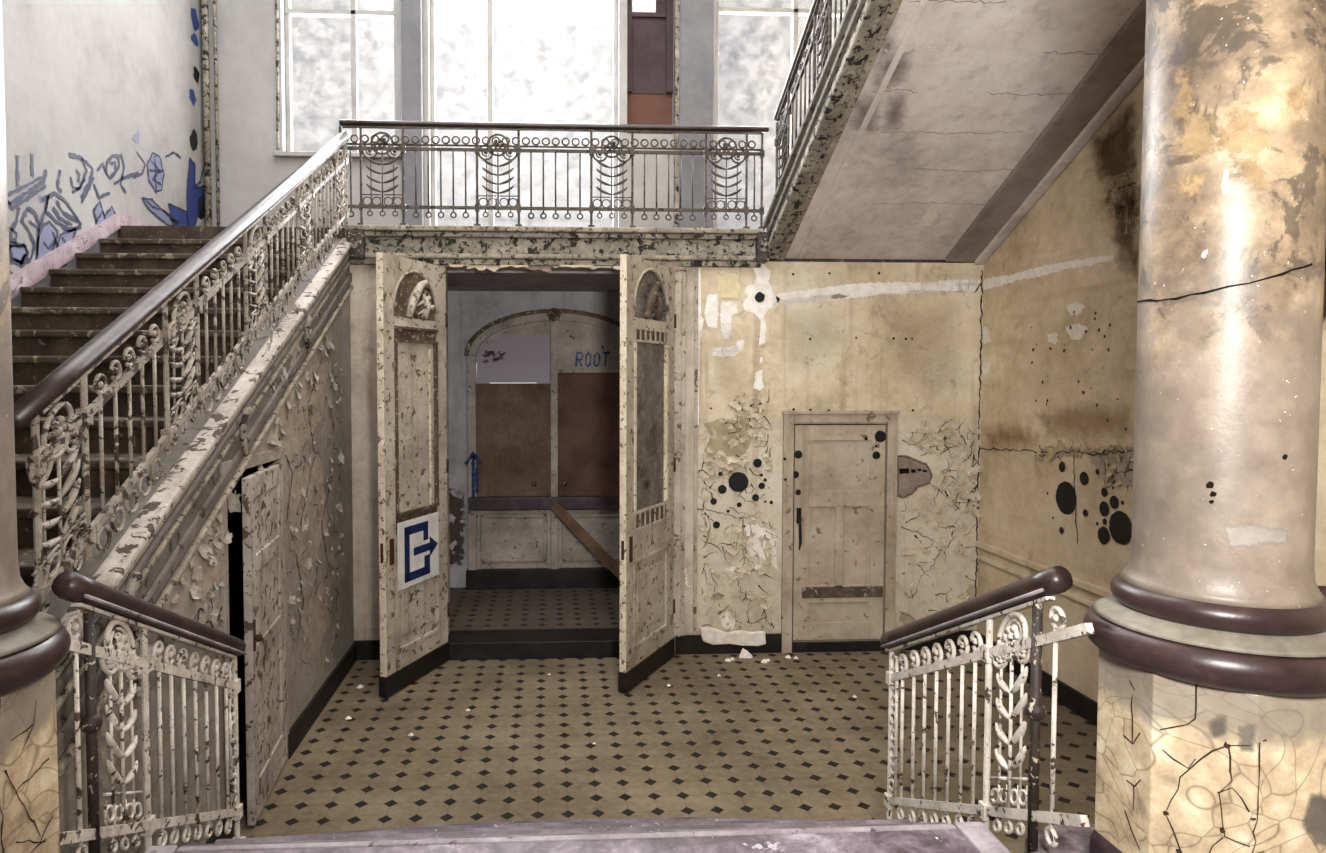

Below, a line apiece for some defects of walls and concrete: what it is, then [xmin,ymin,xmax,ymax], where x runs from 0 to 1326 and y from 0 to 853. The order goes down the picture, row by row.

leakage [1094,107,1139,270]
crack [1137,263,1312,303]
spalling [171,490,242,628]
spalling [262,293,347,675]
spalling [681,392,778,632]
spalling [897,419,982,627]
crack [0,700,54,853]
peeling [126,674,153,697]
crack [1123,681,1267,853]